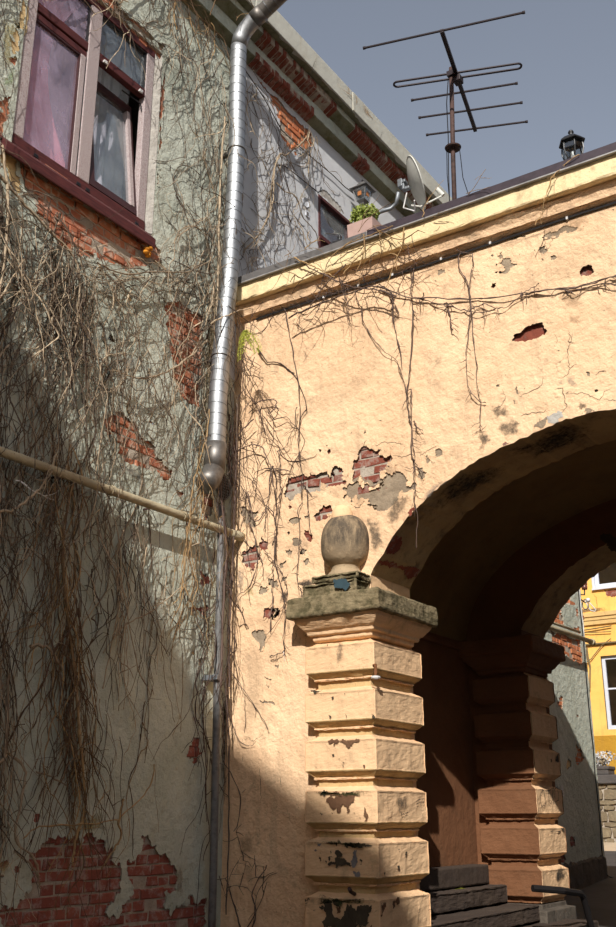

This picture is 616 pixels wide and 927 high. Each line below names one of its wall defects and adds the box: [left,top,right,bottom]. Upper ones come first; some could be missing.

flaking render [248,29,337,155]
spalling [0,149,163,272]
spalling [164,301,205,412]
spalling [512,322,547,342]
spalling [104,411,184,498]
spalling [240,506,274,571]
flaking render [259,446,442,595]
flaking render [252,605,282,653]
spalling [550,598,584,666]
peeling [320,790,368,821]
spalling [0,830,207,927]
peeling [305,897,400,927]